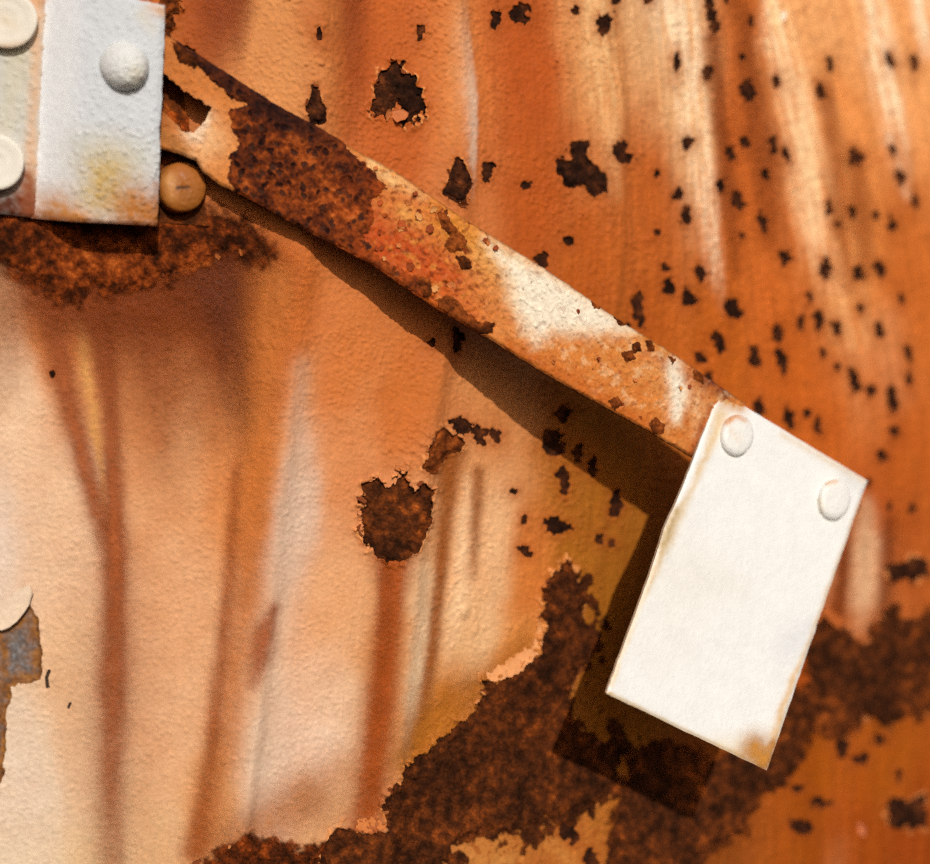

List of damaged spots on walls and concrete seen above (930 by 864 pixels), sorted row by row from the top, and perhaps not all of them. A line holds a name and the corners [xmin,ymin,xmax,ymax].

rust [709,36,732,210]
peeling [0,585,43,783]
rust [353,558,407,834]
rust [403,451,491,765]
rust [836,541,849,613]